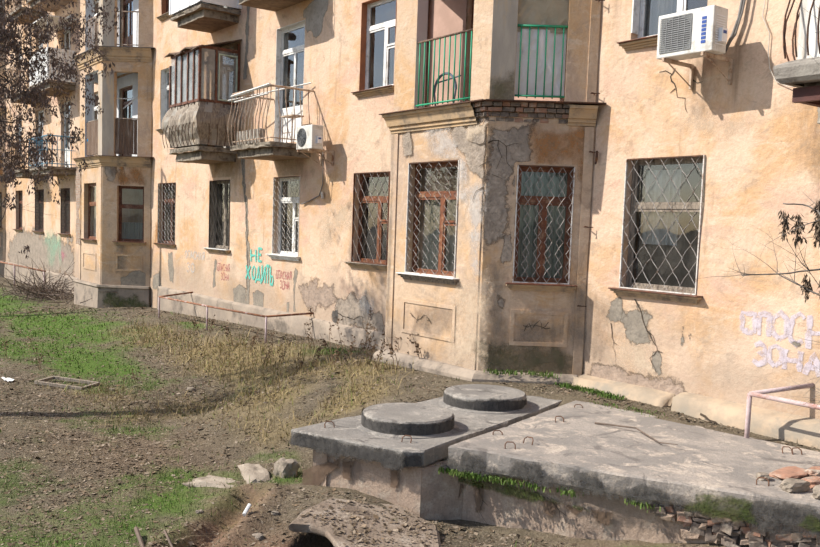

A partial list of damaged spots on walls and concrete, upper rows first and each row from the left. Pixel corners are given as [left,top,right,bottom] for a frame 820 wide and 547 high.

peeling [448,118,536,263]
peeling [298,278,385,332]
spalling [590,297,685,396]
crack [634,299,663,372]